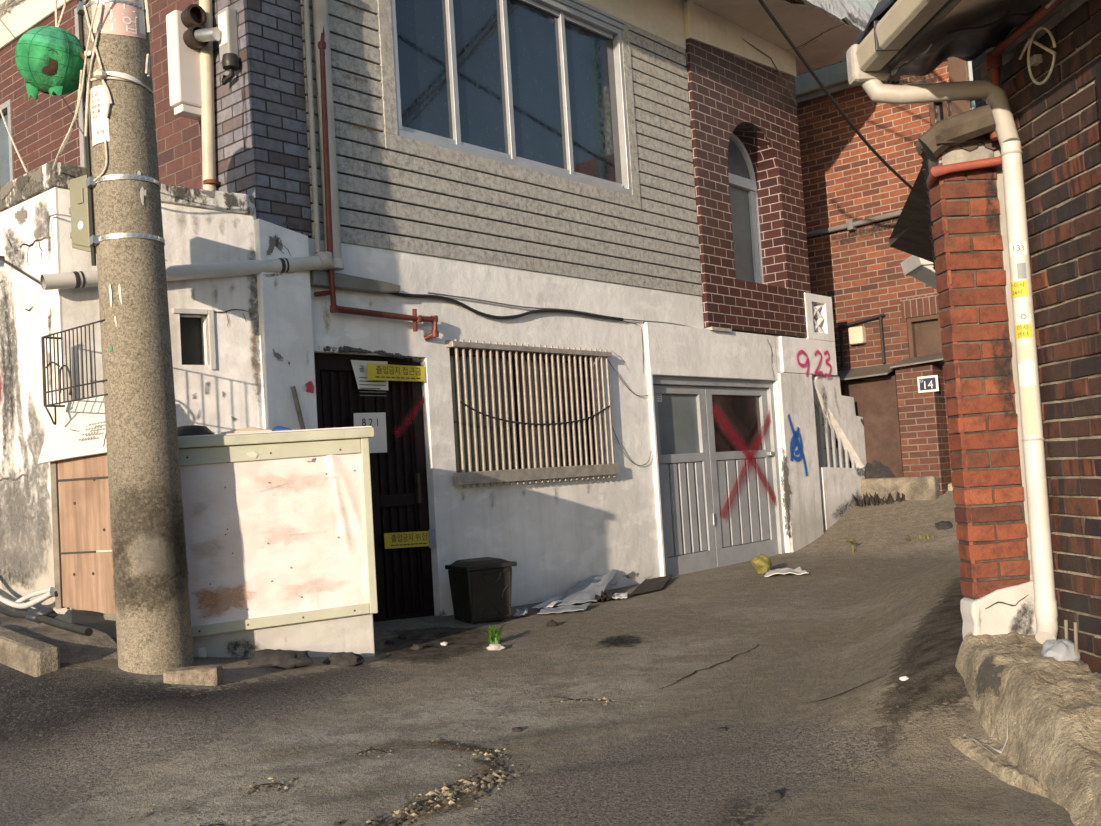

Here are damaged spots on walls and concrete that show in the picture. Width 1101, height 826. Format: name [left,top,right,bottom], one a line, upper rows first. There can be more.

leakage [4,229,24,267]
crack [22,237,51,266]
leakage [34,202,50,258]
leakage [249,275,261,394]
leakage [0,276,50,585]
leakage [113,492,188,609]
rust [197,587,246,618]
crack [539,645,758,707]
crack [806,674,887,704]
crack [96,777,306,826]